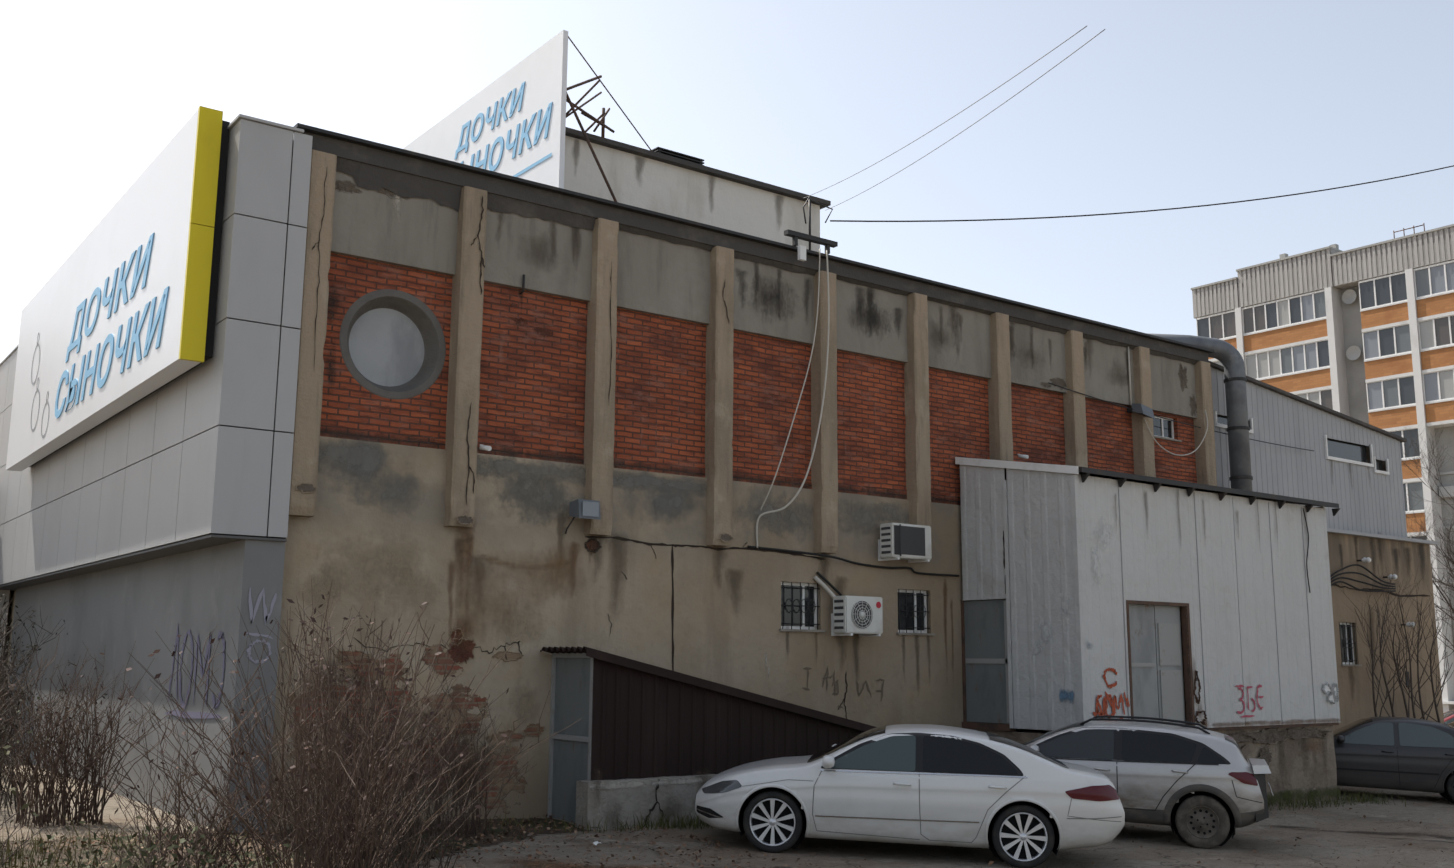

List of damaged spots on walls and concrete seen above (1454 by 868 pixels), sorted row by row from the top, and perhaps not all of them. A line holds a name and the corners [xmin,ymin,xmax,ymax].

crack [312,172,327,364]
crack [471,196,485,294]
crack [466,405,475,505]
spalling [285,628,545,814]